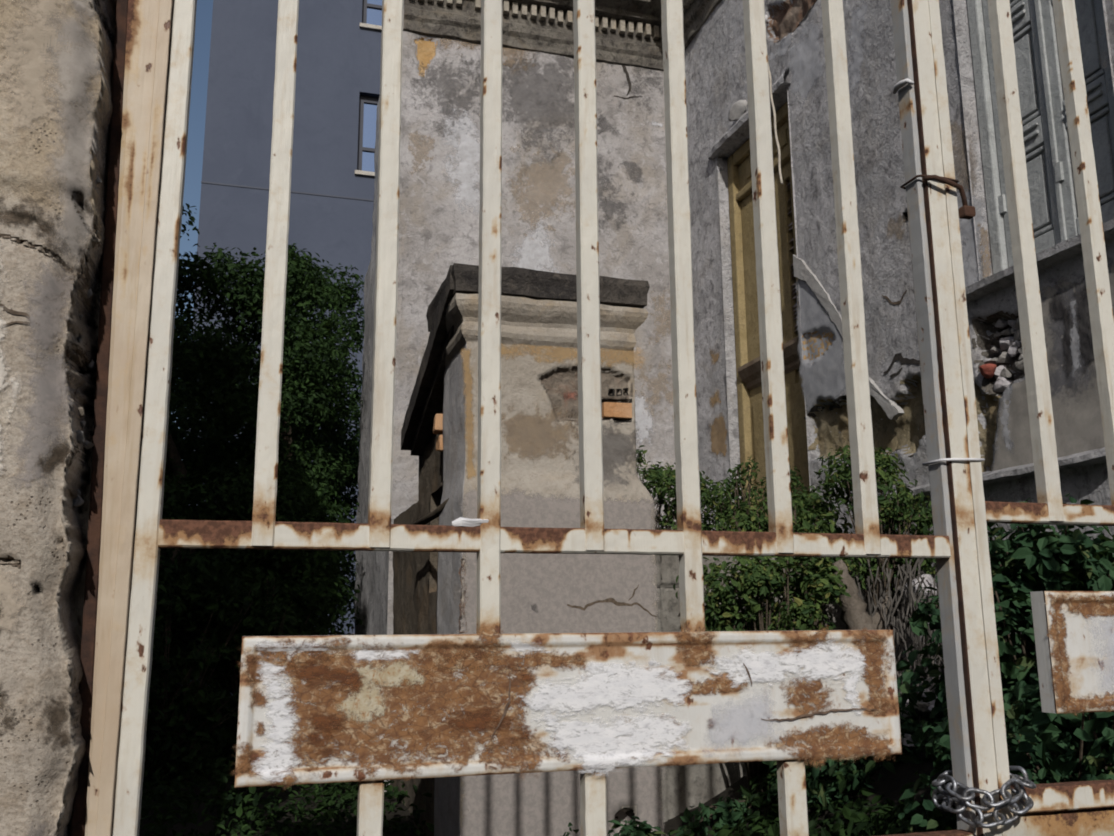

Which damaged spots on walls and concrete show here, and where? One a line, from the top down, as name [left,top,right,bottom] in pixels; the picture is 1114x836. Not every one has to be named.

spalling [767,0,816,43]
crack [0,234,72,272]
spalling [0,0,117,836]
spalling [539,366,579,422]
spalling [601,368,633,422]
spalling [971,311,1025,472]
crack [567,585,657,617]